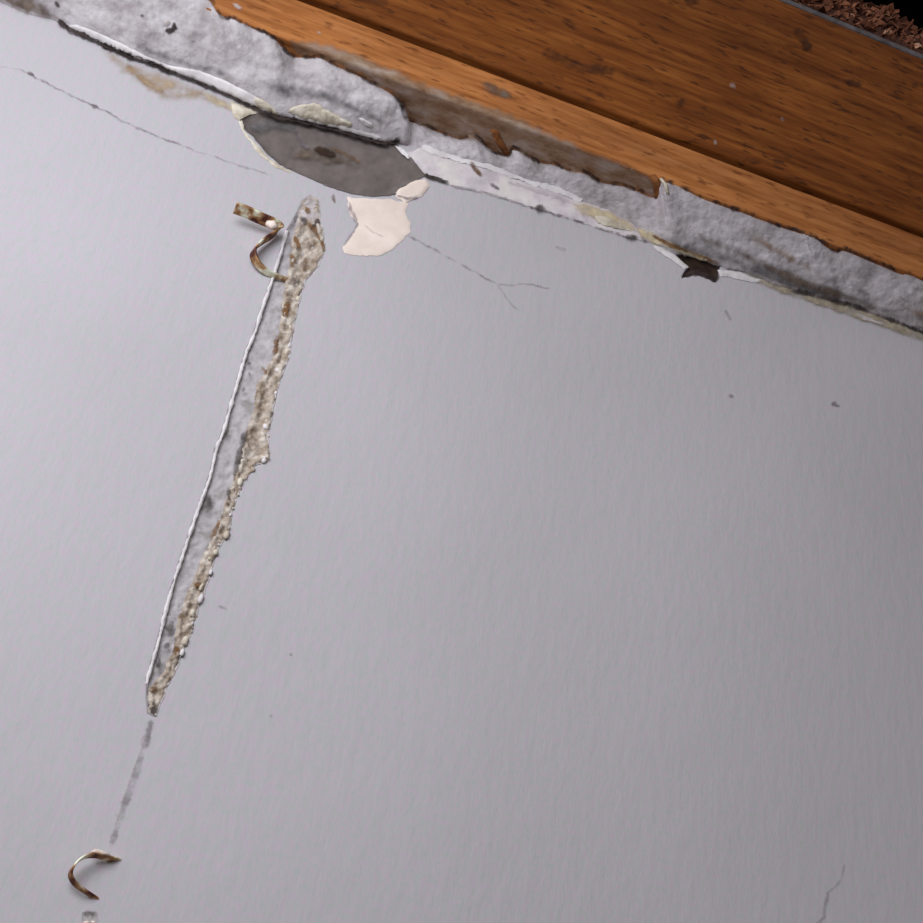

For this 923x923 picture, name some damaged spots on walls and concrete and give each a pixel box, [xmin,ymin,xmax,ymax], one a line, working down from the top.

crack [58,19,400,145]
spalling [69,25,760,283]
spalling [147,195,325,716]